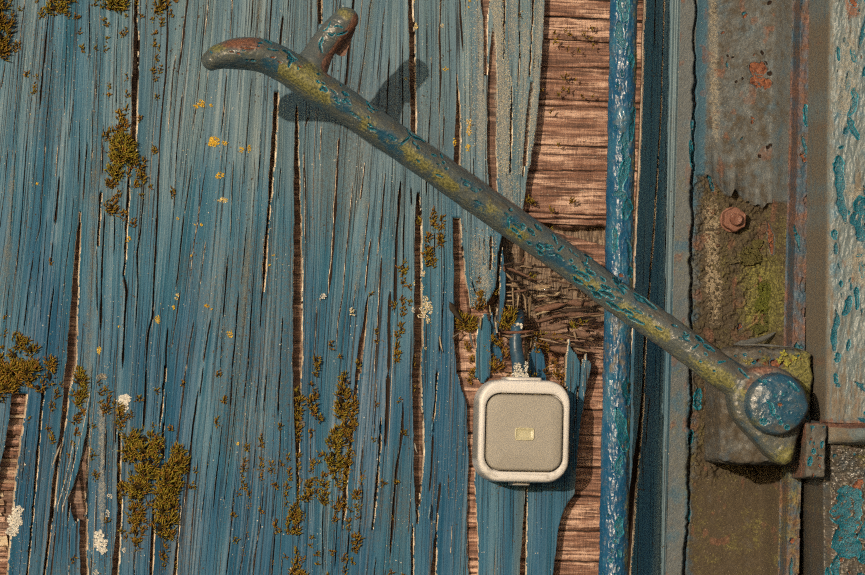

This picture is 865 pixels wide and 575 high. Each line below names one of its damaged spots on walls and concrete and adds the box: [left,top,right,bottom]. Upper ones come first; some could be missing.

peeling [316,72,378,132]
crack [317,0,535,192]
peeling [613,101,636,220]
corrosion [748,60,772,91]
crack [0,0,492,575]
peeling [505,208,803,372]
peeling [829,254,865,388]
peeling [806,416,836,478]
peeling [825,485,865,575]